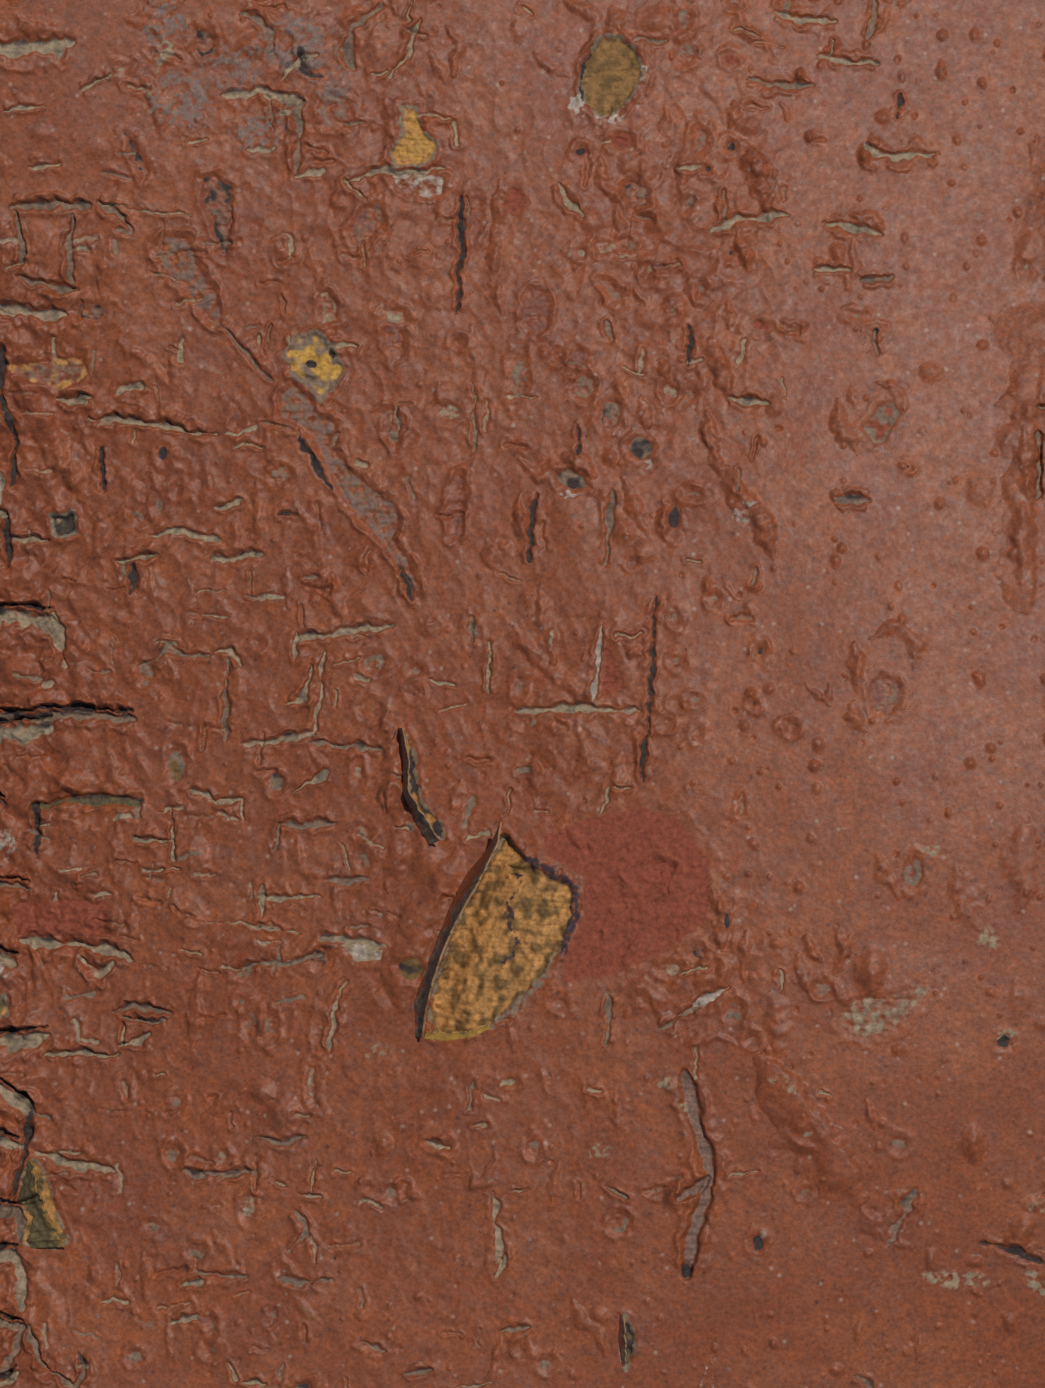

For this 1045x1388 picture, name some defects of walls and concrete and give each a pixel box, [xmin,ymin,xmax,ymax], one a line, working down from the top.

peeling [259,282,430,608]
peeling [372,395,472,461]
crack [1029,396,1045,500]
peeling [1,890,122,944]
peeling [302,822,583,1047]
peeling [14,1113,79,1258]
crack [658,986,735,1282]